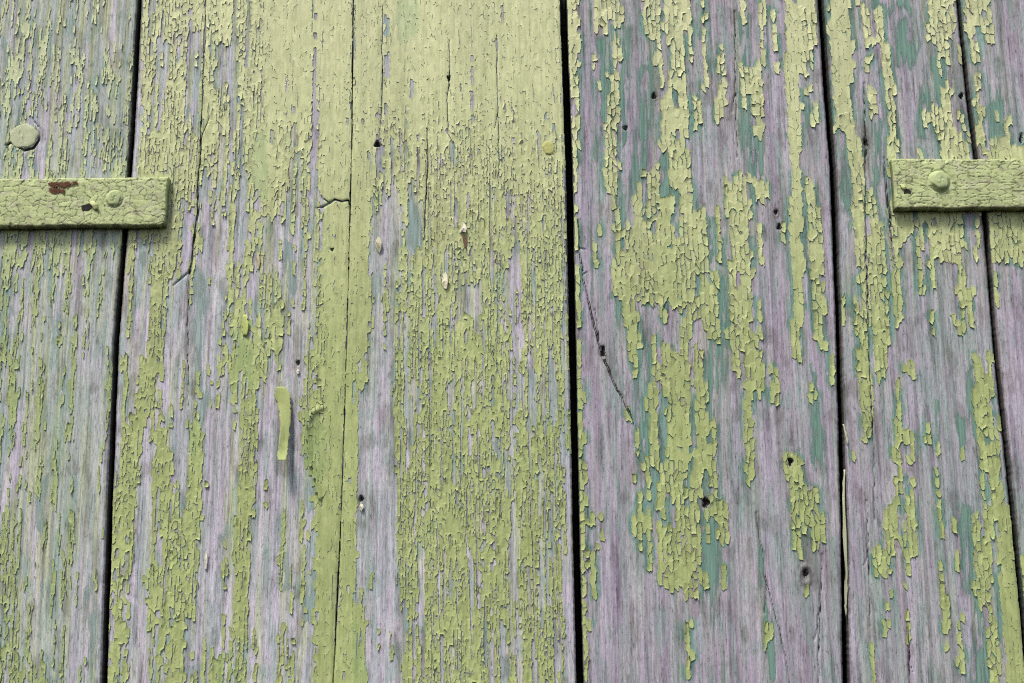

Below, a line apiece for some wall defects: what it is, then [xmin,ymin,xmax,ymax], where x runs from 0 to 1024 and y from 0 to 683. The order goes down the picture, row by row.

peeling [0,229,123,683]
rust [48,181,78,194]
peeling [0,0,227,305]
peeling [274,387,331,683]
crack [577,223,637,431]
peeling [624,169,770,601]
peeling [641,0,780,168]
peeling [782,451,826,560]
peeling [790,175,836,386]
peeling [855,0,911,194]
peeling [841,150,957,683]
peeling [922,0,995,160]